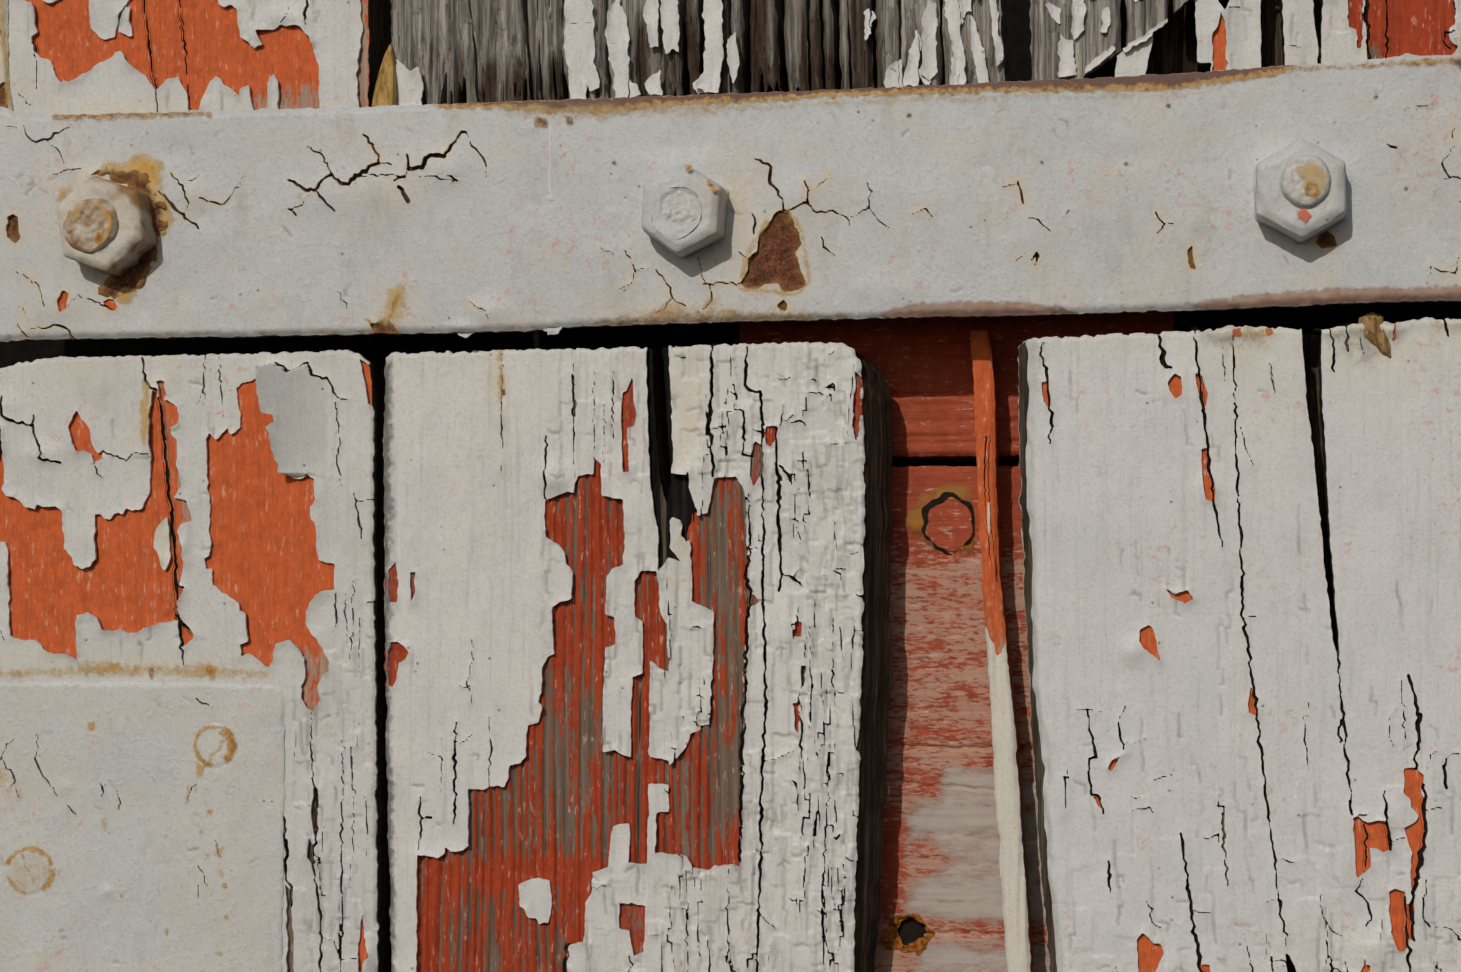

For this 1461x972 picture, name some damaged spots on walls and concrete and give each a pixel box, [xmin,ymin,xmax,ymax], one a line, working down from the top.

peeling [25,0,320,110]
peeling [563,0,680,99]
rust [59,189,112,247]
rust [93,155,174,303]
rust [606,210,812,326]
crack [1039,343,1054,444]
peeling [0,381,194,659]
peeling [206,379,335,711]
peeling [417,426,777,972]
crack [686,343,836,972]
crack [1077,706,1174,813]
crack [1146,323,1461,972]